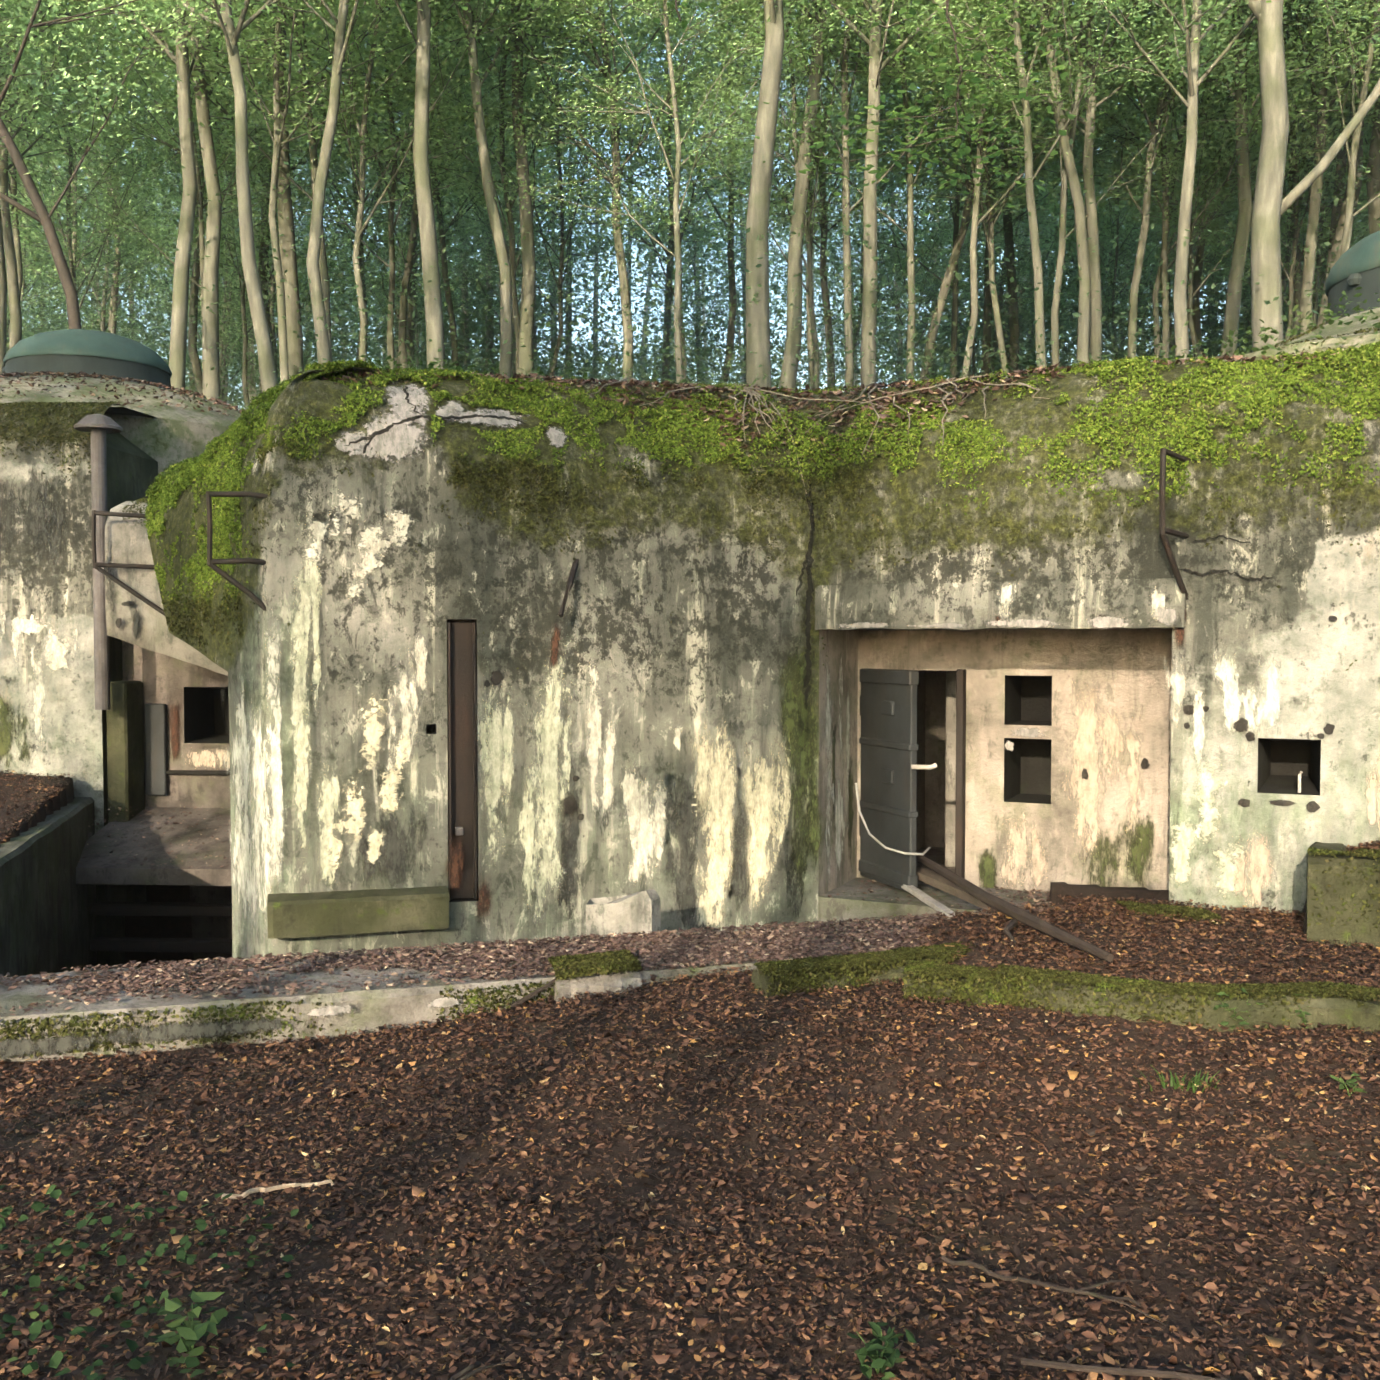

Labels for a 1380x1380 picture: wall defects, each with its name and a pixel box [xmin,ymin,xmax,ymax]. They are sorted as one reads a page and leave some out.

spalling [335,384,531,464]
spalling [546,426,568,448]
leakage [0,468,68,564]
crack [1179,535,1275,581]
leakage [0,614,46,767]
leakage [184,556,340,930]
leakage [356,634,428,888]
leakage [477,643,854,929]
corrosion [446,838,466,889]
corrosion [477,882,491,923]